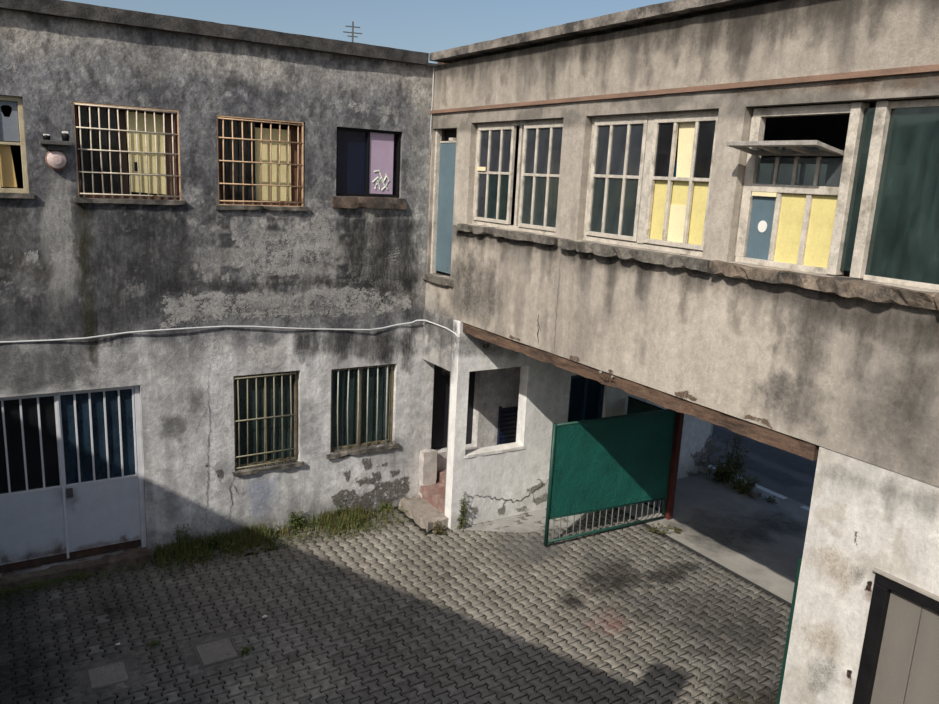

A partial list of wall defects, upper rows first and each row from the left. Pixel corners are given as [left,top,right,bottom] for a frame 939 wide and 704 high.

water stain [44,174,117,354]
peeling [159,211,412,329]
crack [196,363,239,531]
flaking render [331,441,410,512]
crack [468,479,549,510]